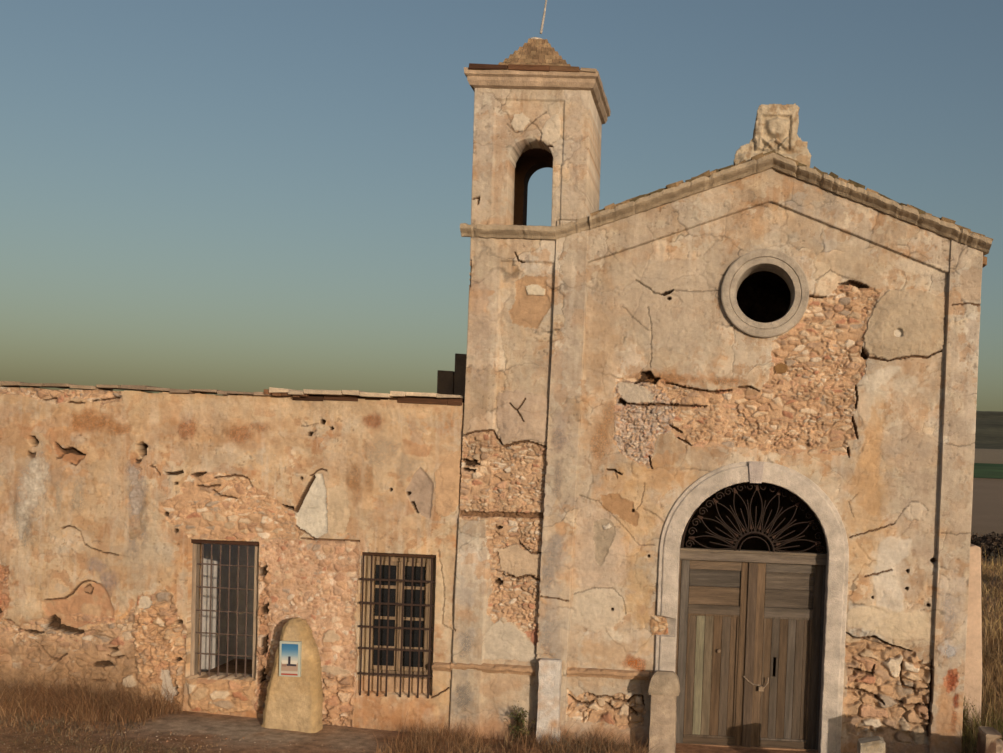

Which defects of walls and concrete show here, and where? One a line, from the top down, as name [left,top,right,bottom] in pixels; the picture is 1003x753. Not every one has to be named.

crack [622,280,720,369]
spalling [613,281,883,469]
spalling [56,444,86,467]
crack [62,525,119,556]
spalling [0,469,361,727]
spalling [406,430,548,657]
crack [864,569,893,578]
crack [848,493,910,539]
spalling [567,689,647,730]
spalling [843,632,960,747]